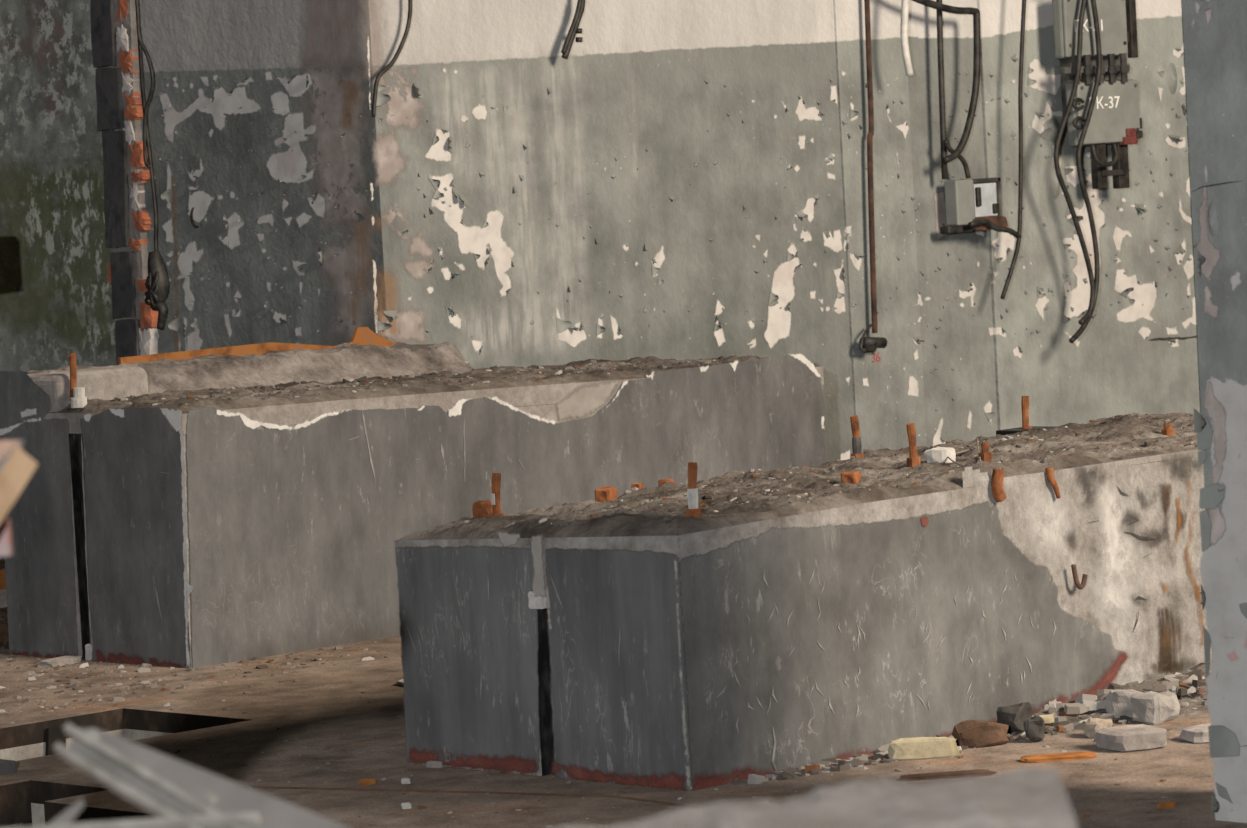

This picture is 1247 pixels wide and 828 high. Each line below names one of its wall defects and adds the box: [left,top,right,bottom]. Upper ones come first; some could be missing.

damp [0,0,116,372]
peeling [154,36,515,352]
peeling [745,194,878,349]
peeling [1230,272,1241,291]
peeling [445,305,483,366]
spalling [217,410,343,430]
spalling [449,399,468,417]
spalling [489,380,628,424]
rust [991,468,1006,502]
rust [1045,467,1060,499]
spalling [962,375,1247,823]
rust [1176,500,1204,639]